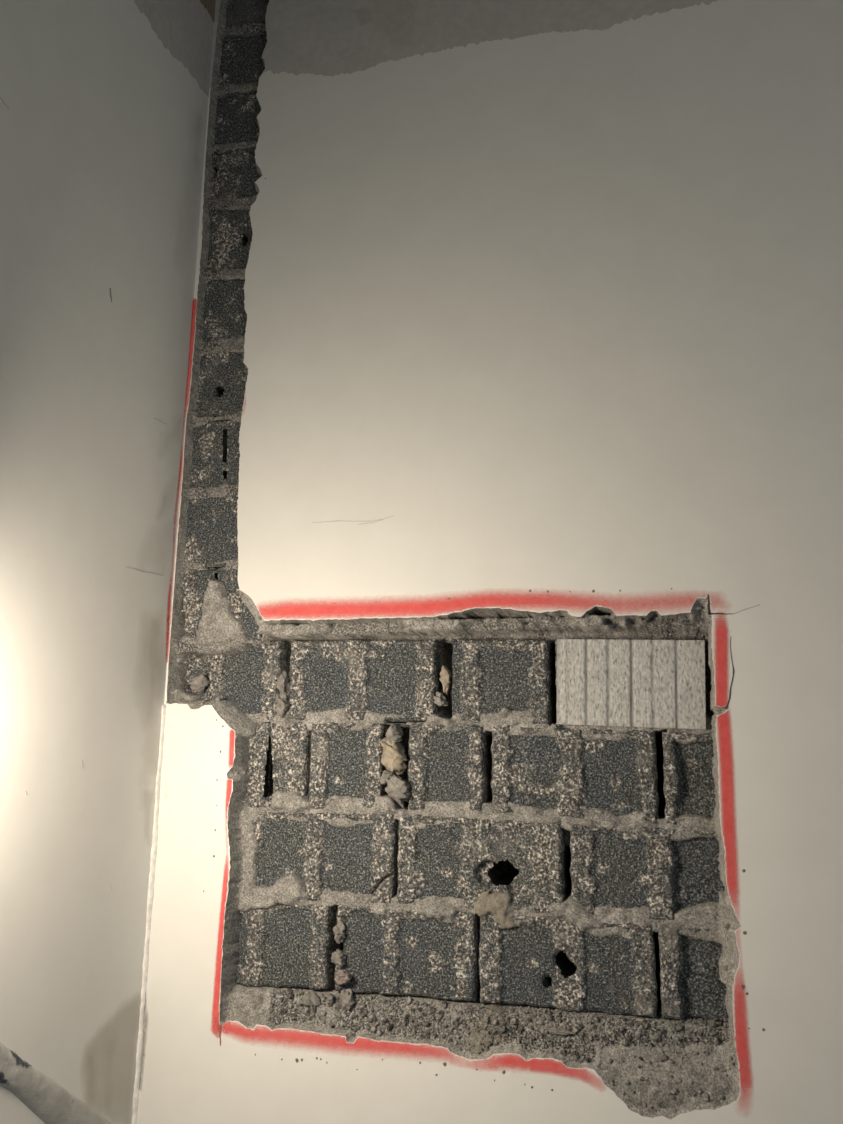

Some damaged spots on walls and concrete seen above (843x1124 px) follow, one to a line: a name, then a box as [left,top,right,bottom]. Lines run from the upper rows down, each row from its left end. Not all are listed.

spalling [166,0,741,1120]
crack [725,637,734,709]